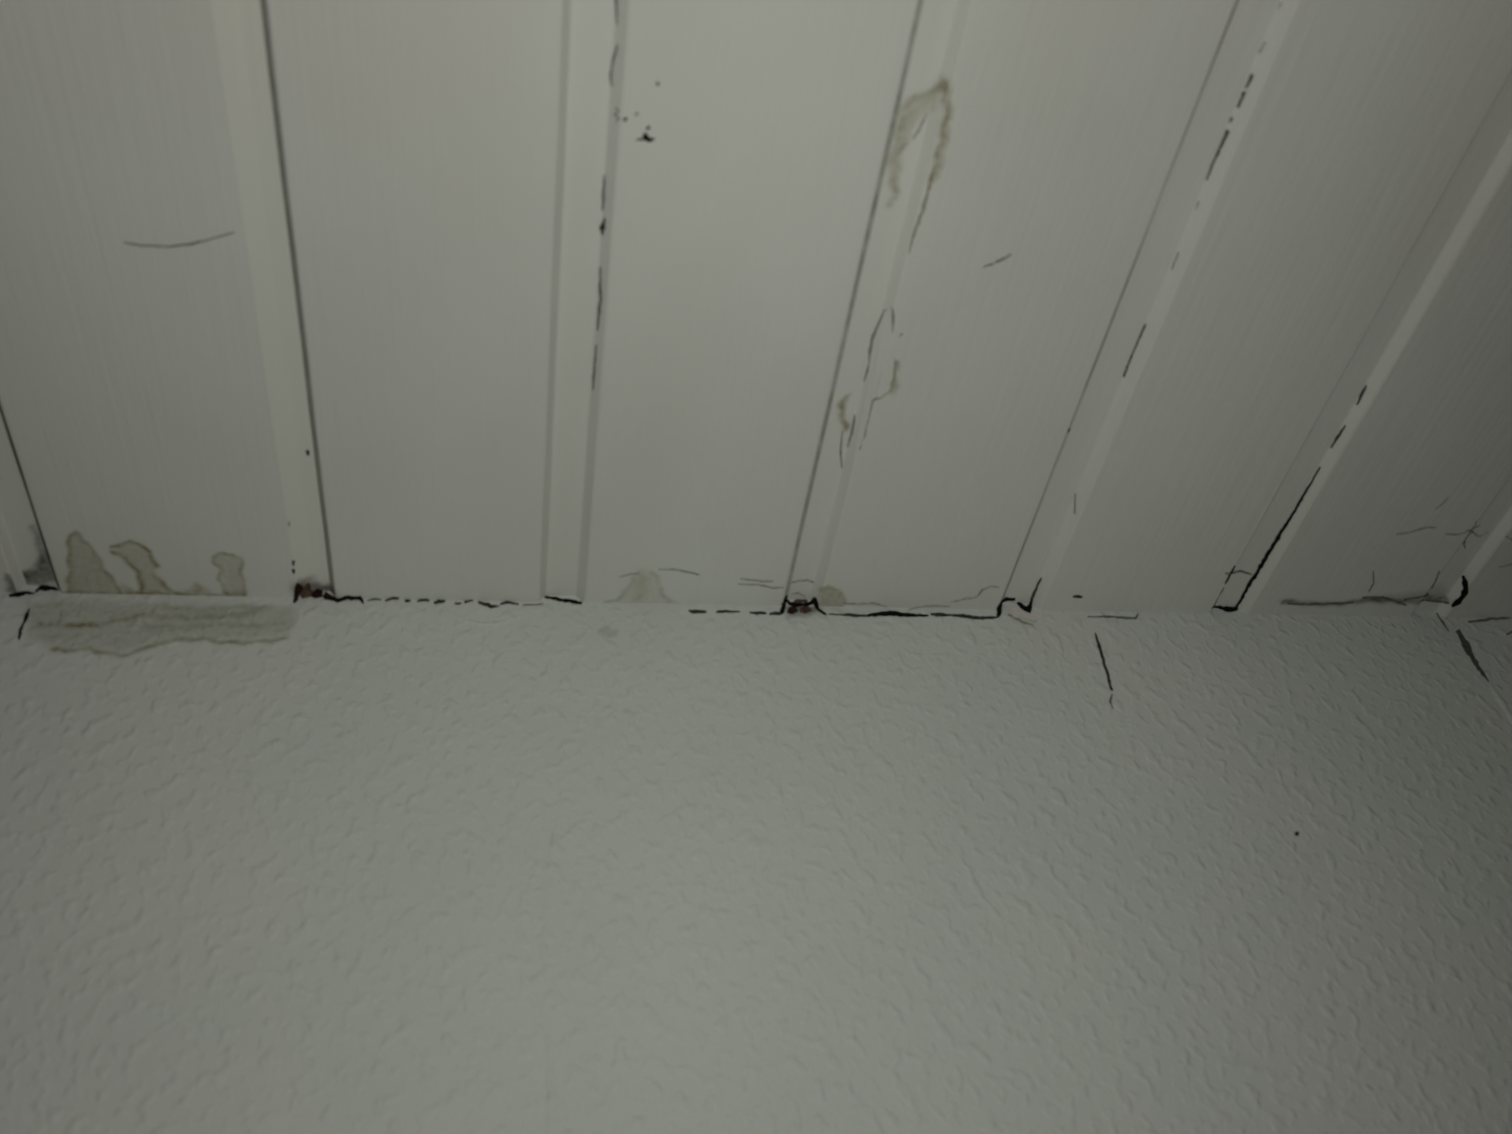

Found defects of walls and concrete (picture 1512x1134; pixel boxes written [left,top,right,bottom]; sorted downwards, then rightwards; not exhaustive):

crack [333,595,582,609]
crack [619,568,1042,620]
crack [1287,497,1512,682]
crack [1087,613,1139,709]